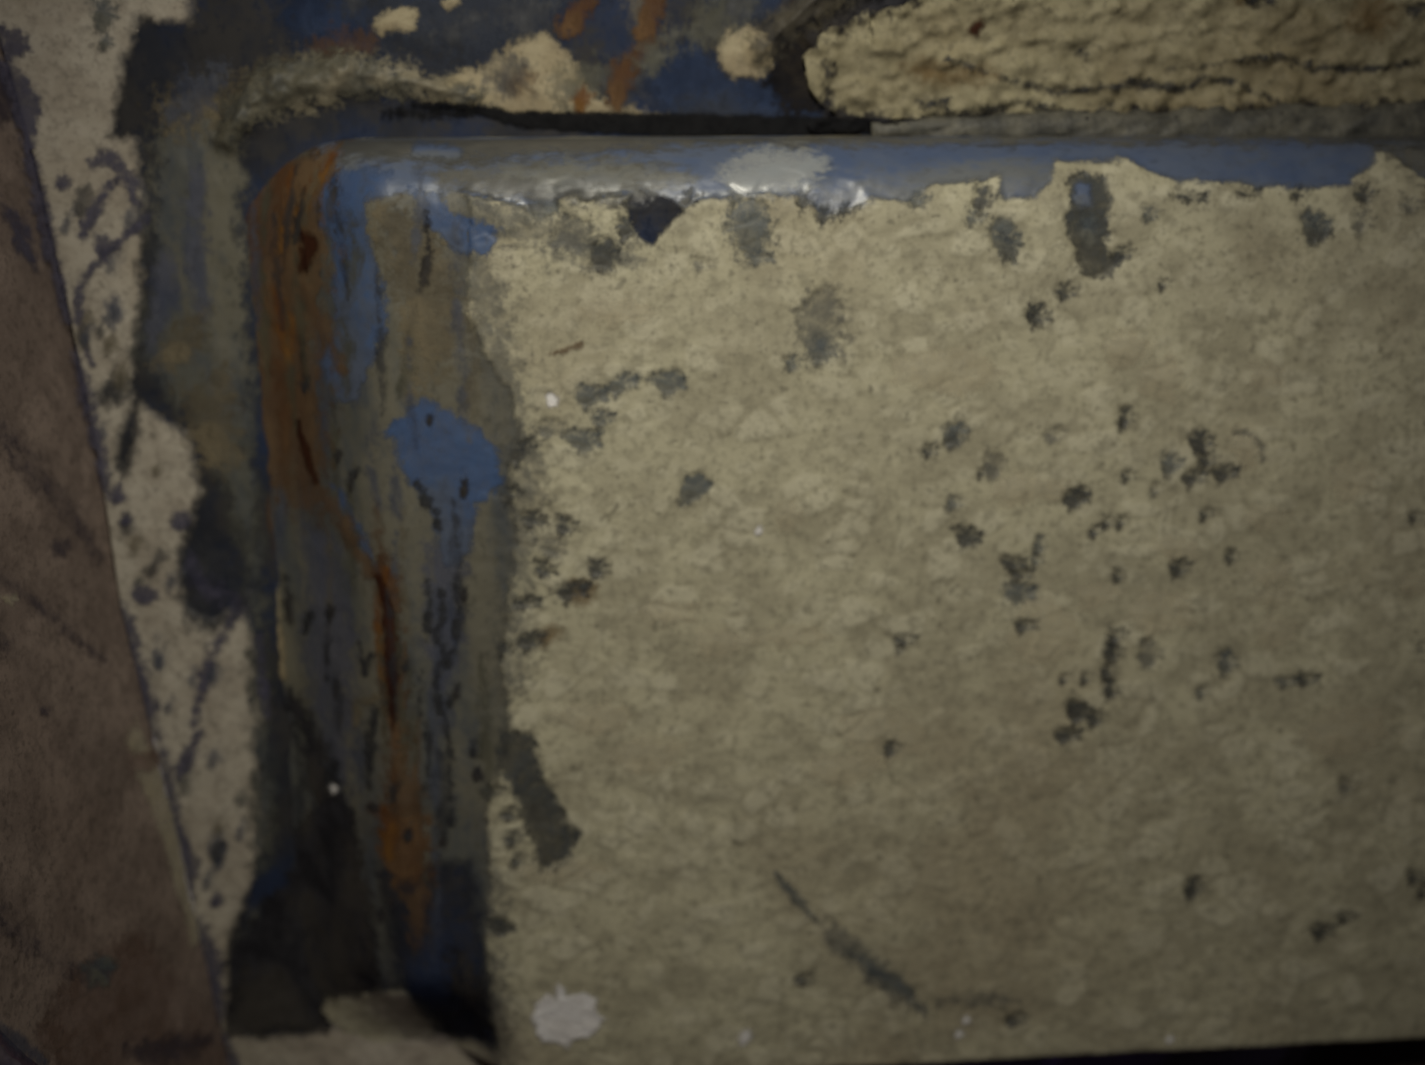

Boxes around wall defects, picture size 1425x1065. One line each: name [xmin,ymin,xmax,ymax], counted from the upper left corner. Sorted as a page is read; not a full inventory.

peeling [373,7,419,37]
peeling [444,31,581,113]
rust [554,0,598,40]
rust [574,0,665,113]
peeling [578,0,883,119]
peeling [0,25,72,324]
peeling [548,218,636,273]
peeling [990,216,1024,264]
peeling [1065,170,1137,279]
peeling [562,369,688,454]
peeling [1151,429,1241,496]
peeling [1054,627,1154,744]